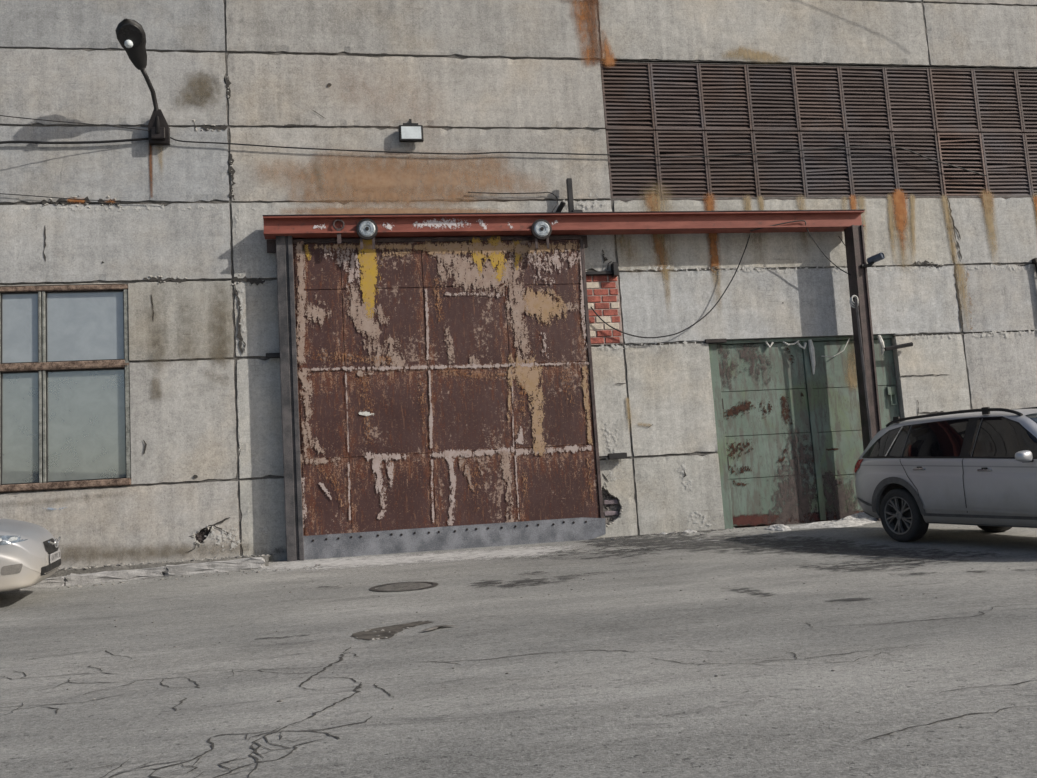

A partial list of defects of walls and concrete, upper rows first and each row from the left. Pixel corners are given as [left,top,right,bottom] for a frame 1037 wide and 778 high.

corrosion [575,0,615,66]
water stain [183,74,212,103]
corrosion [888,190,915,259]
corrosion [709,233,720,294]
peeling [294,218,858,528]
corrosion [848,344,858,387]
spalling [190,526,241,551]
water stain [556,533,994,576]
corrosion [732,511,837,526]
crack [426,604,1031,684]
crack [0,647,394,778]
crack [863,680,1037,741]